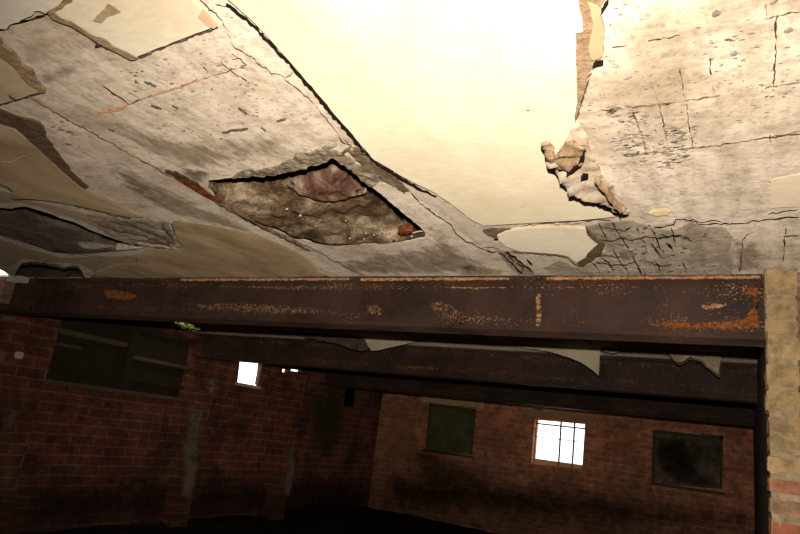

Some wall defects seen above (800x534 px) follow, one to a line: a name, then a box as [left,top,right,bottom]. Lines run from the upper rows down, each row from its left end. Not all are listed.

rust [165,169,250,223]
spalling [208,143,425,246]
spalling [15,261,85,279]
spalling [14,207,183,252]
rust [104,288,137,301]
spalling [483,227,535,276]
crack [520,219,619,227]
spalling [543,220,734,276]
rust [536,232,761,331]
crack [641,209,799,229]
peeling [666,350,721,378]